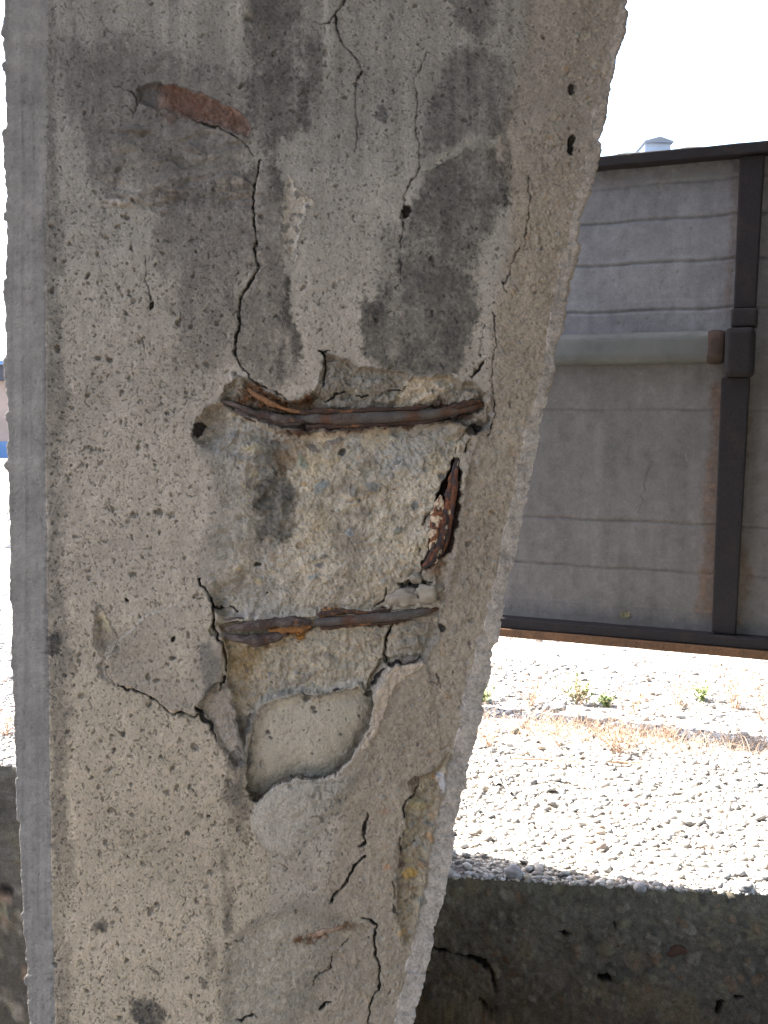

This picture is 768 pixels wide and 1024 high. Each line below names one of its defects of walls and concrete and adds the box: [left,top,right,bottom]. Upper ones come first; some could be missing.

leakage [250,0,307,146]
crack [322,0,363,139]
crack [234,160,287,400]
leakage [252,277,304,379]
leakage [360,51,511,374]
crack [472,177,532,377]
rust [237,382,473,437]
spalling [193,351,495,801]
crack [118,578,239,741]
crack [331,813,368,902]
crack [313,939,348,1010]
crack [362,885,396,1021]